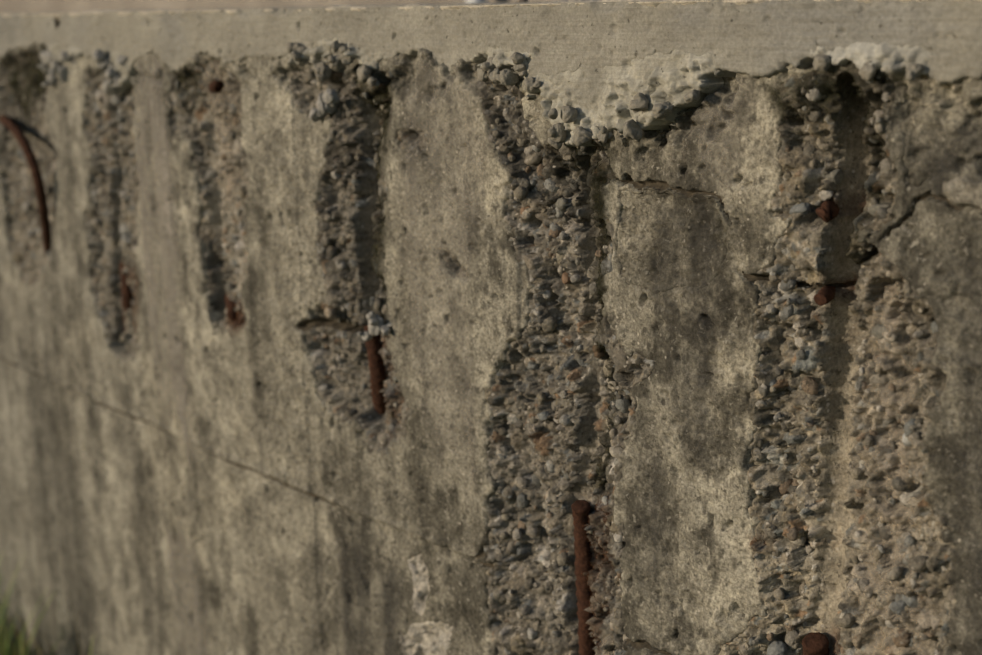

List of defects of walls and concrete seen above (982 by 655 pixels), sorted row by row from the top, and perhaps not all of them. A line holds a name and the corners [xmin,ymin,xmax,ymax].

spalling [0,48,59,287]
spalling [84,67,141,359]
crack [95,401,169,432]
spalling [170,57,250,330]
crack [212,453,341,507]
crack [297,316,364,333]
spalling [289,65,411,455]
spalling [397,120,429,158]
spalling [475,78,727,655]
crack [620,175,728,215]
spalling [718,68,982,655]
crack [742,191,979,289]